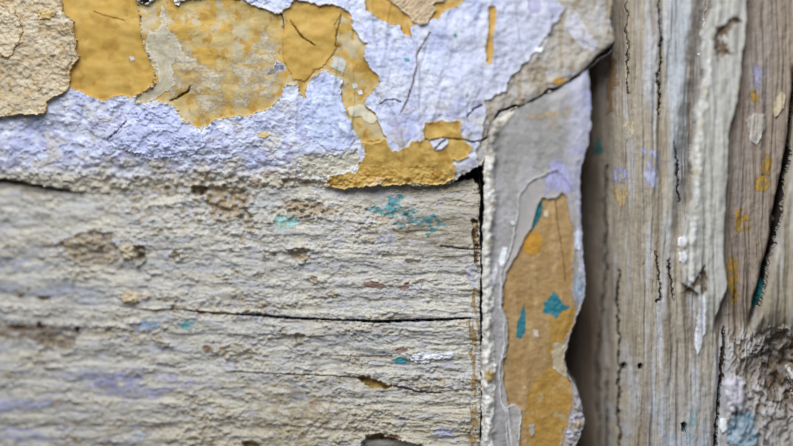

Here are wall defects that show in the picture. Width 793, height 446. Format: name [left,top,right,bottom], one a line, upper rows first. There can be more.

peeling [0,0,615,190]
crack [425,1,631,149]
crack [655,0,663,116]
crack [0,178,72,193]
crack [756,82,793,306]
crack [120,306,471,323]
peeling [491,169,585,446]